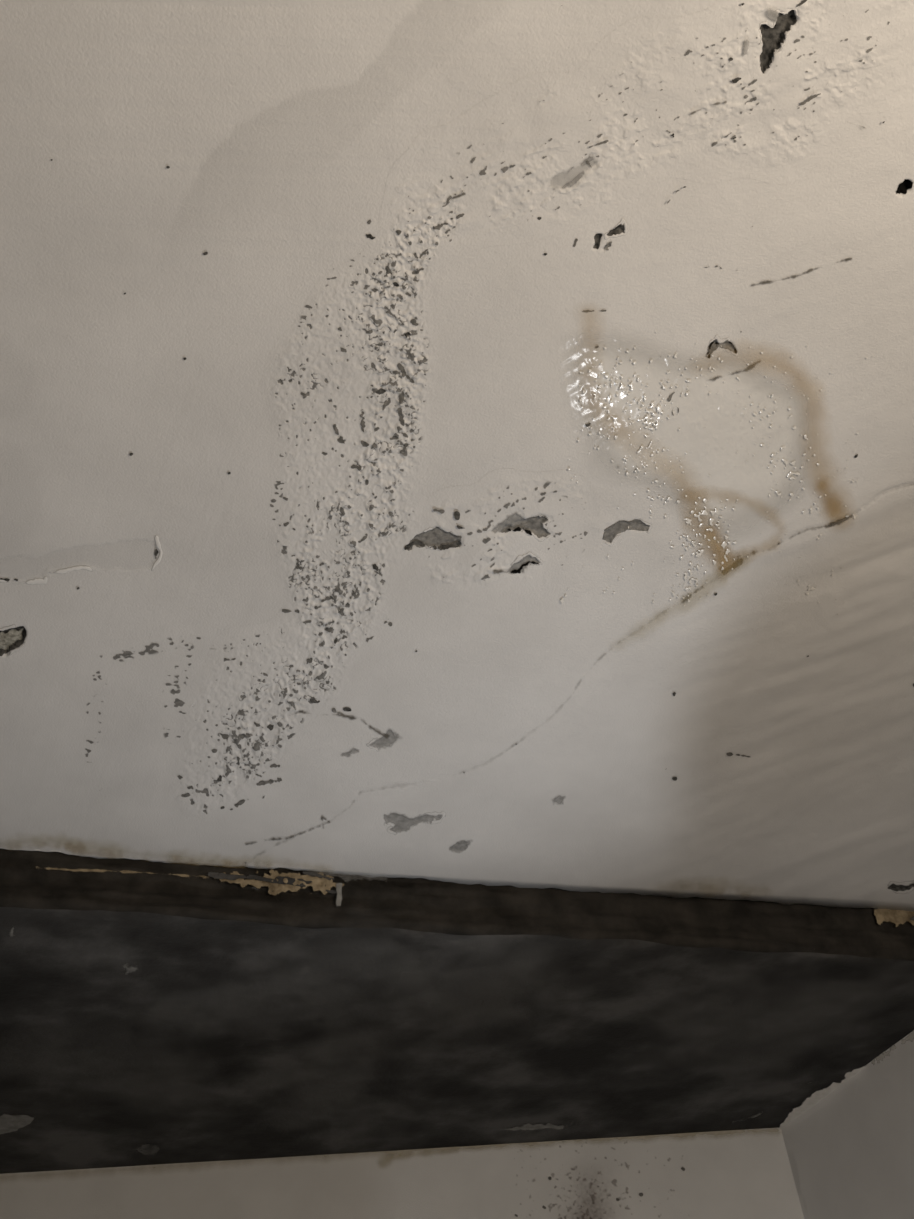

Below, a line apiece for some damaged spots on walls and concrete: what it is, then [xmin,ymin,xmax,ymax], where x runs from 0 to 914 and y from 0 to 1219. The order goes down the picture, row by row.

spalling [743,0,807,74]
spalling [593,218,628,250]
damp [578,329,856,607]
peeling [404,509,463,551]
peeling [492,513,550,574]
peeling [603,519,652,546]
crack [753,516,852,554]
spalling [0,625,26,656]
peeling [299,699,356,720]
peeling [342,726,399,757]
spalling [384,811,446,835]
damp [381,1129,777,1153]